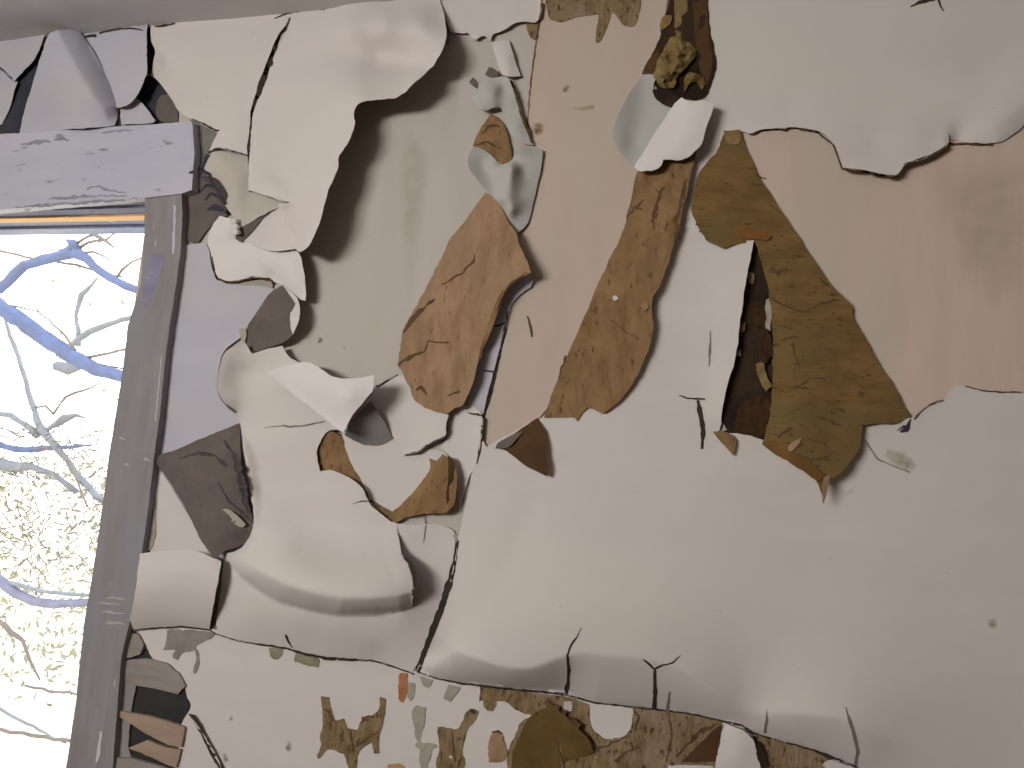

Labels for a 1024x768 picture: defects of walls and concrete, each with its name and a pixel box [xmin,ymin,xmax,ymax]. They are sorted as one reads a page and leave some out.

peeling [0,24,156,133]
crack [192,12,297,175]
crack [750,128,994,177]
peeling [130,0,541,768]
peeling [417,0,1024,768]
crack [132,540,860,768]